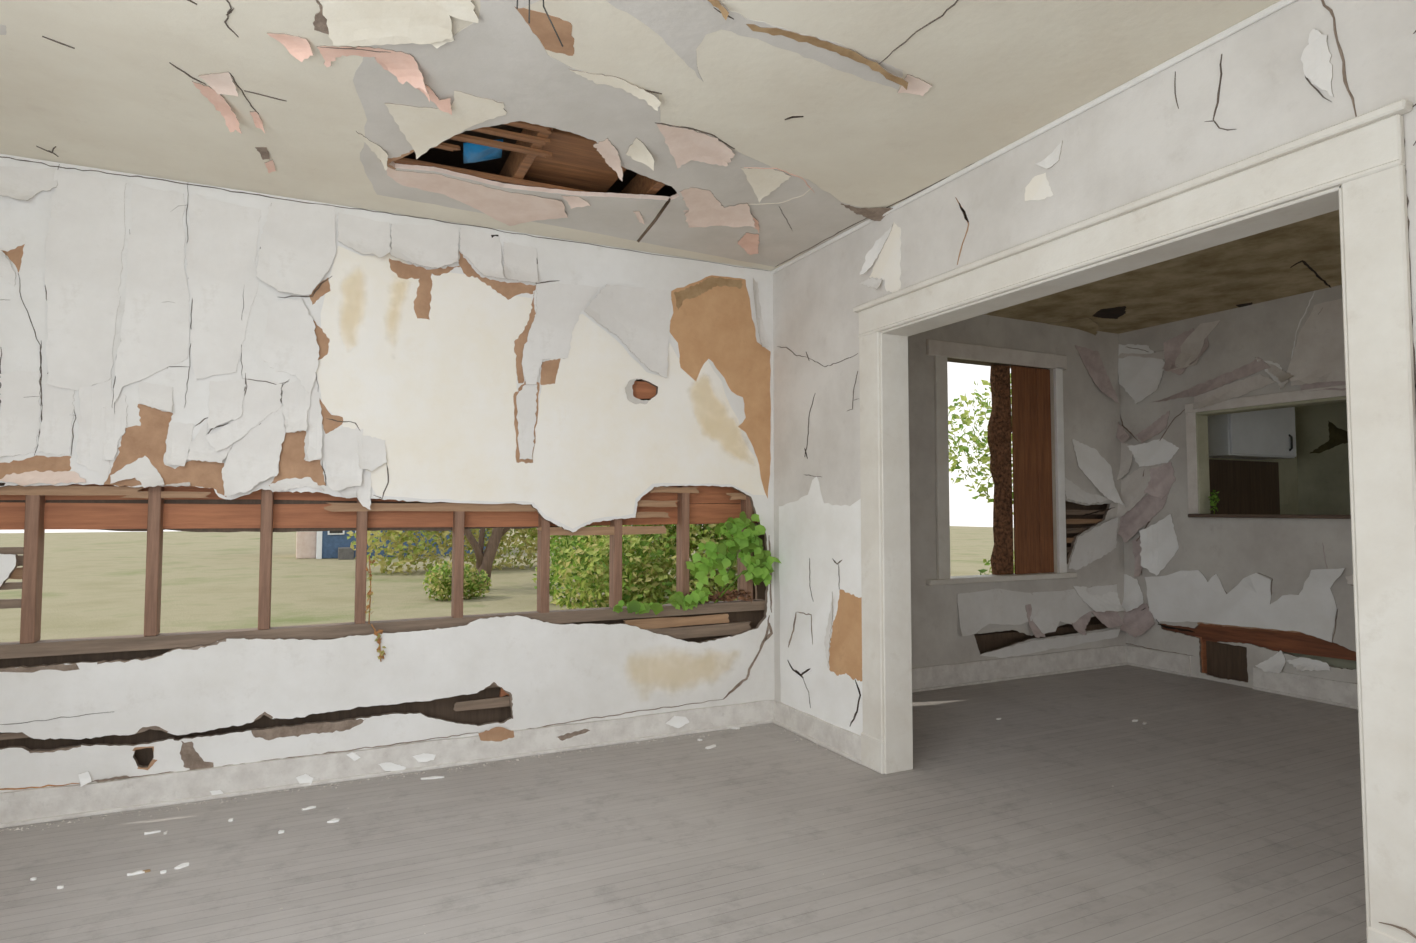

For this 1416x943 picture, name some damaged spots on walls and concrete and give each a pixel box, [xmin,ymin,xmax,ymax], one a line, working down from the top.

peeling [267,0,507,170]
crack [879,0,958,64]
crack [1300,0,1357,117]
crack [0,146,974,271]
peeling [569,69,814,255]
crack [280,276,332,298]
peeling [1193,291,1346,409]
peeling [0,184,863,741]
peeling [957,411,1353,658]
crack [528,540,842,729]
flaking render [78,726,214,786]
crack [0,732,479,790]